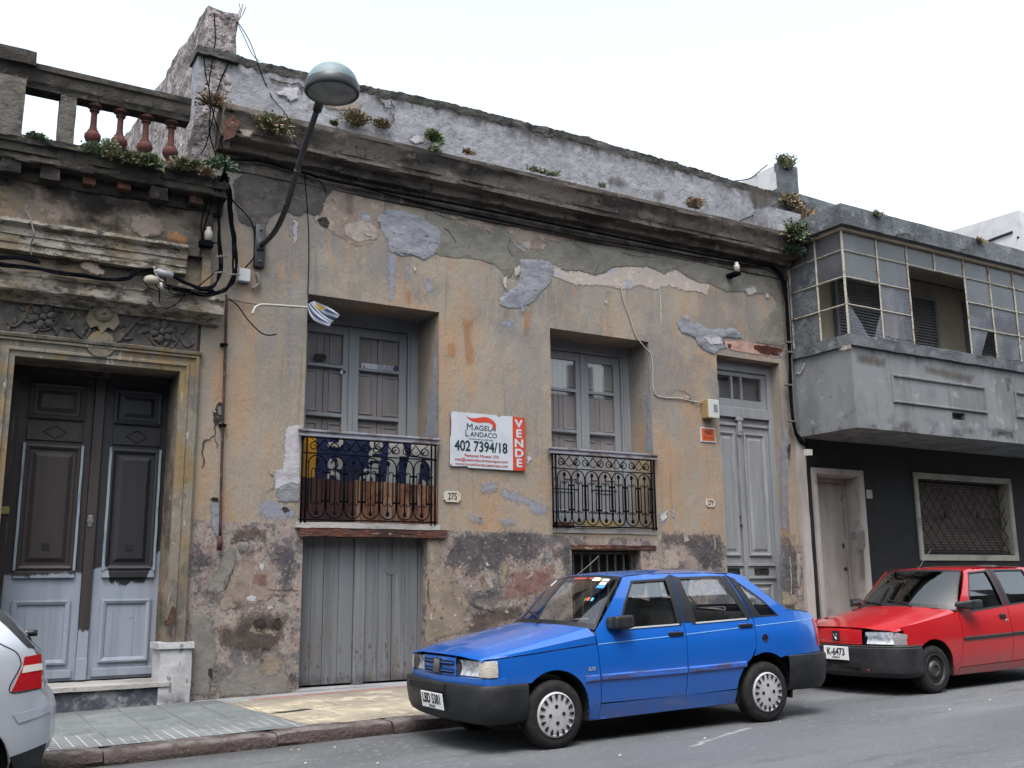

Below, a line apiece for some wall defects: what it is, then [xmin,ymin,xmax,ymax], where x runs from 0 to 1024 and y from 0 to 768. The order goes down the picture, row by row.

flaking render [315,190,386,246]
peeling [553,265,710,295]
peeling [704,336,723,345]
flaking render [192,425,302,637]
leakage [468,605,521,632]